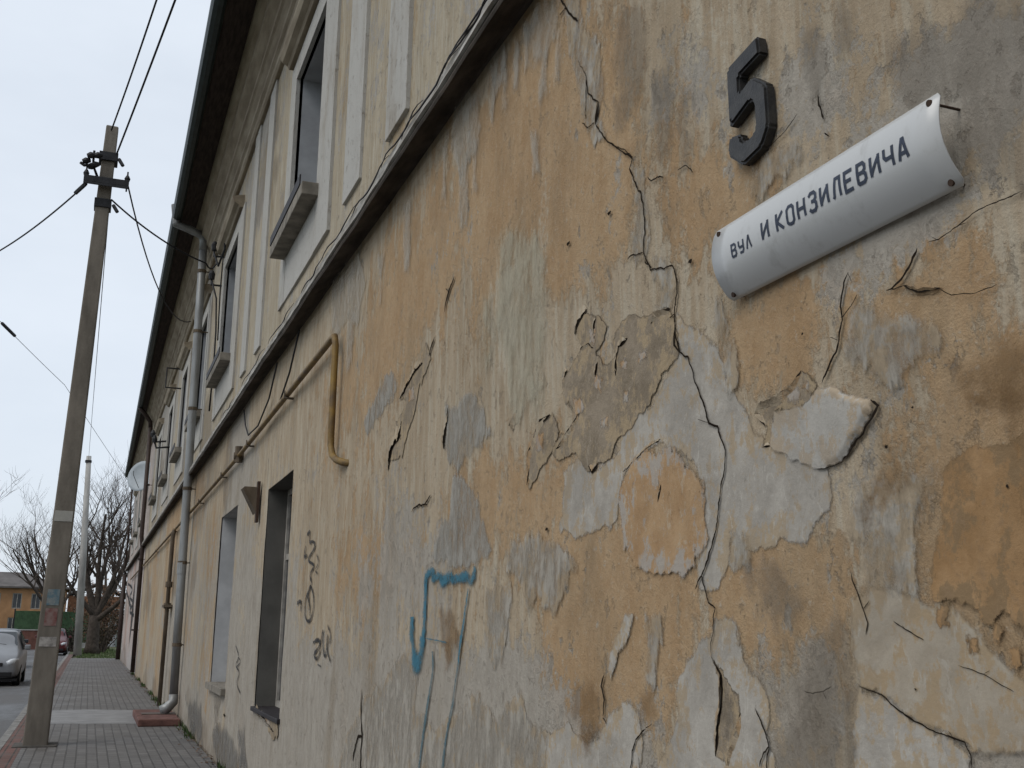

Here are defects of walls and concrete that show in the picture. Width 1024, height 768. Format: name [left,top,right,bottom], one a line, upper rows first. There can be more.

crack [560,0,578,21]
crack [886,191,1021,296]
crack [822,272,857,382]
flaking render [504,165,832,614]
crack [578,61,769,768]
flaking render [846,465,1024,768]
crack [860,686,972,766]